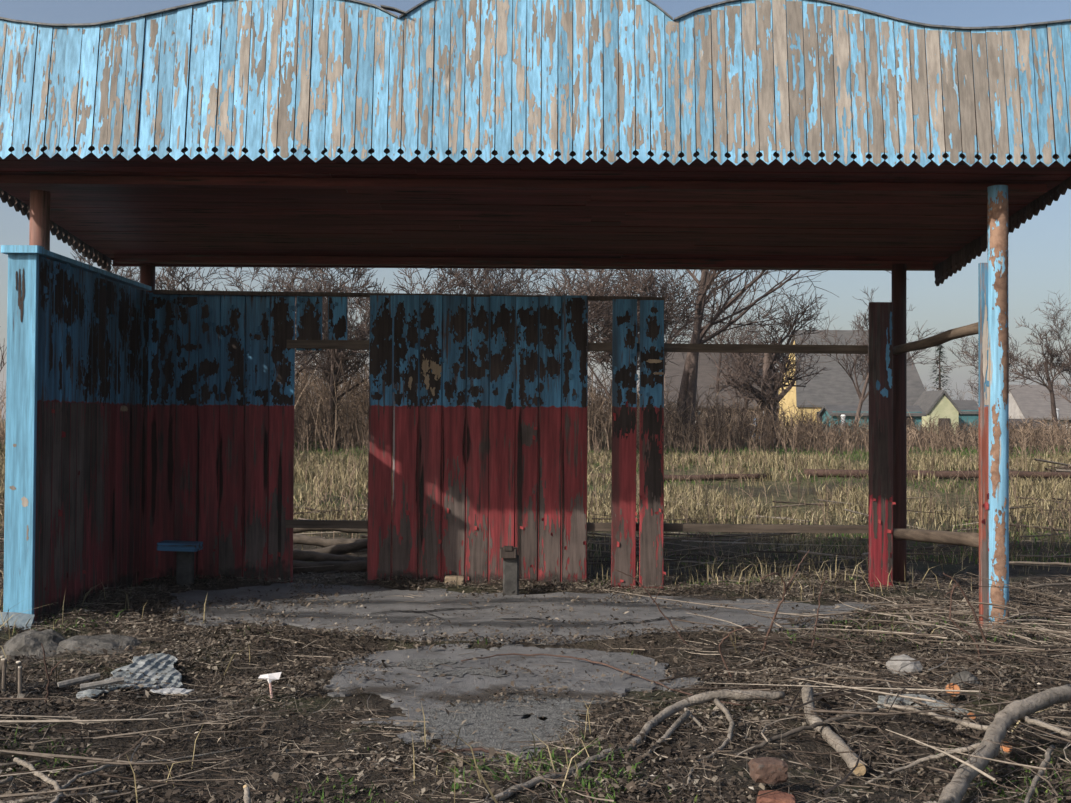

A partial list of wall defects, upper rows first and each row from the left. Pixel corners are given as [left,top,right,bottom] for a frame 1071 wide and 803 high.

peeling [0,0,1071,165]
peeling [36,259,346,623]
peeling [377,456,492,582]
peeling [369,297,587,448]
peeling [520,458,586,583]
peeling [612,302,666,587]
peeling [873,419,896,581]
rust [987,188,1009,631]